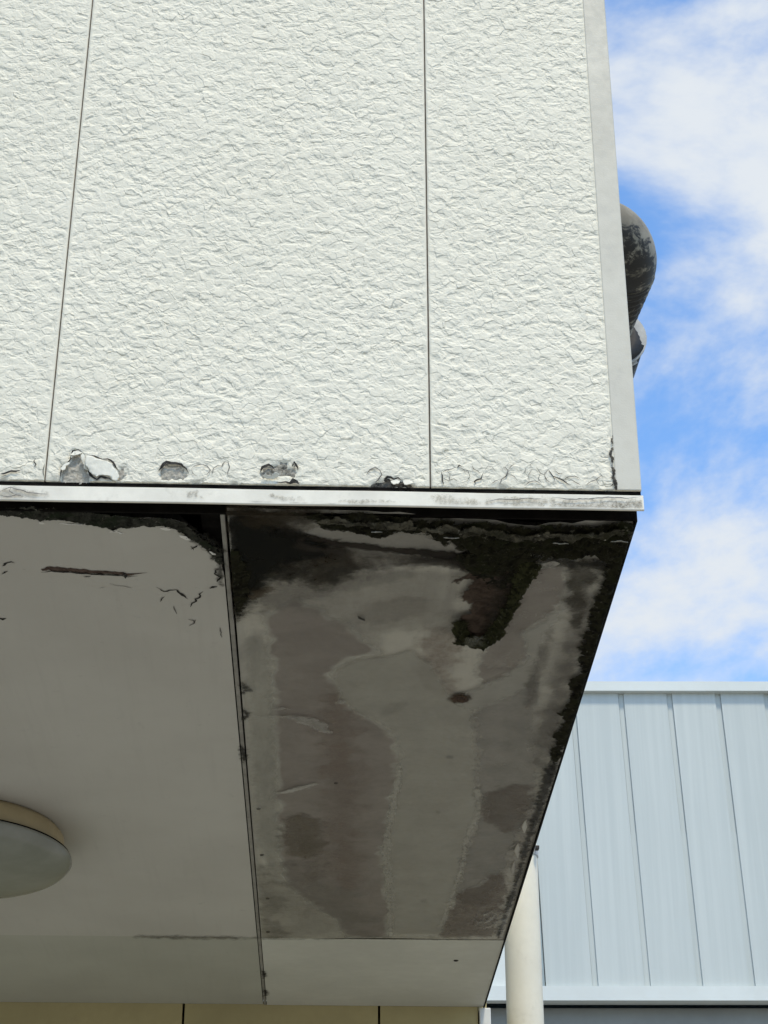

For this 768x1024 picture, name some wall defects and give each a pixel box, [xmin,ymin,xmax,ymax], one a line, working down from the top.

spalling [60,449,126,484]
spalling [158,461,188,481]
spalling [260,461,299,484]
spalling [367,467,414,488]
crack [441,438,618,490]
damp [189,505,476,622]
crack [41,567,222,625]
damp [263,535,629,939]